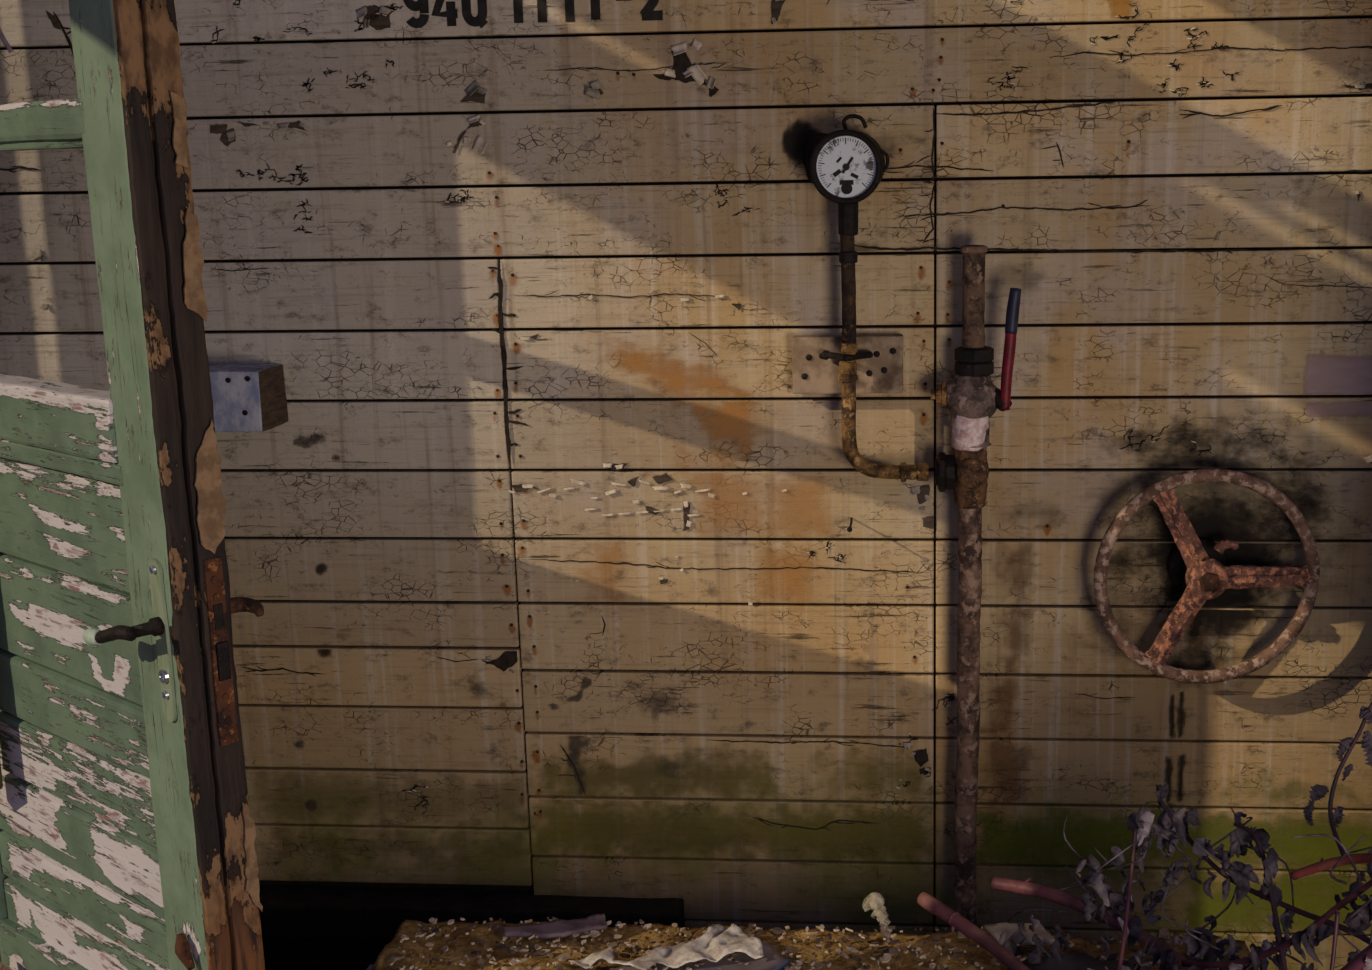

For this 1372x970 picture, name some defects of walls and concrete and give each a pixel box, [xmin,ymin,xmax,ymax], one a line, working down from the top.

crack [543,62,729,72]
crack [831,0,1372,288]
crack [714,184,760,216]
peeling [183,208,208,321]
rust [618,351,753,453]
water stain [1169,692,1185,737]
water stain [568,736,588,792]
water stain [1165,755,1185,801]